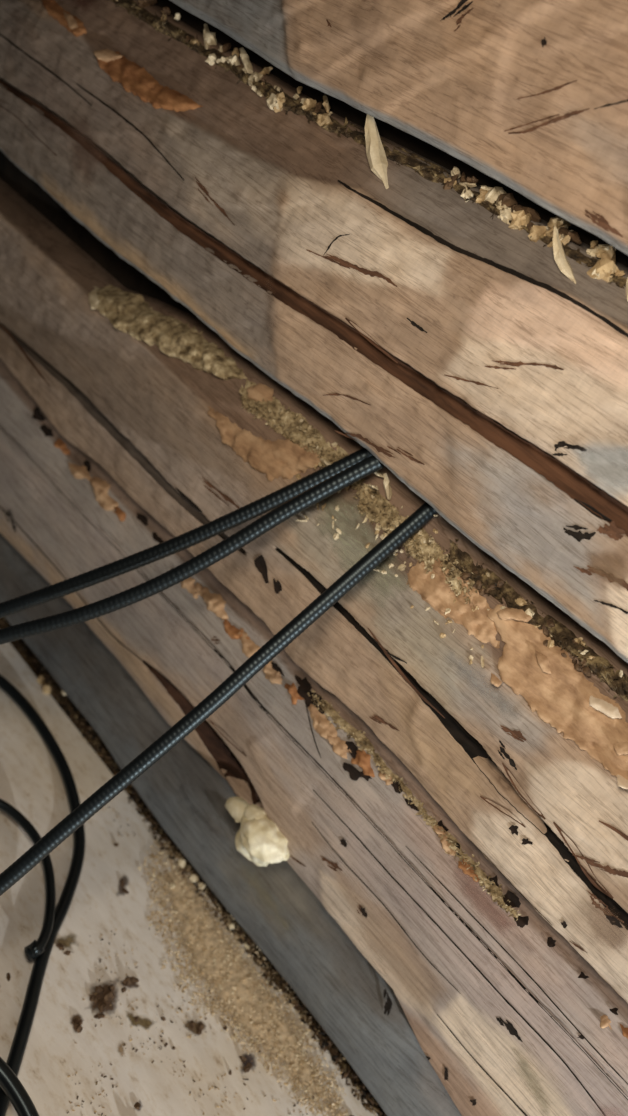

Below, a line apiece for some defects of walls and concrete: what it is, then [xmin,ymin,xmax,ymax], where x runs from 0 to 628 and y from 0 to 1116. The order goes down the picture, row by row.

crack [0,34,184,181]
crack [0,80,628,554]
crack [0,427,628,1116]